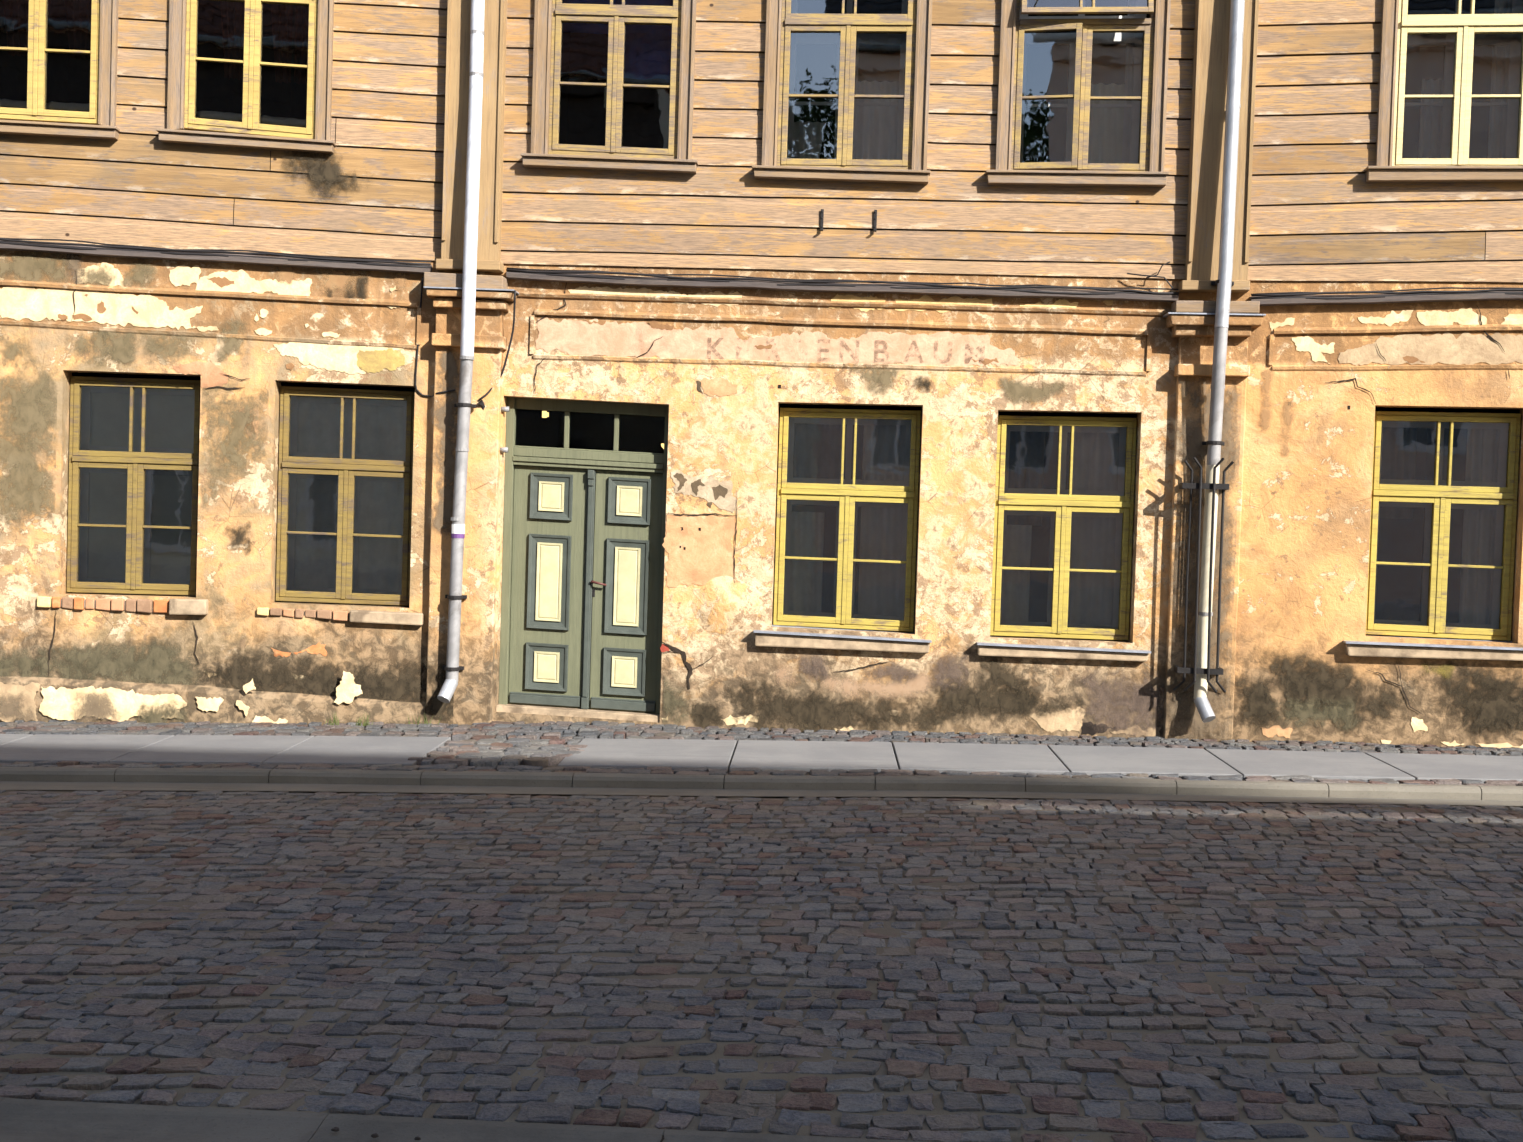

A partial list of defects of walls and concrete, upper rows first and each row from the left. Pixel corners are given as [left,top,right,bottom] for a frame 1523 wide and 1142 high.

leakage [77,331,189,365]
peeling [0,262,405,374]
leakage [218,321,244,360]
peeling [1266,307,1523,366]
leakage [0,336,57,524]
leakage [663,368,1406,740]
leakage [0,649,52,678]
spalling [0,678,288,724]
leakage [204,654,454,722]
spalling [334,671,363,705]
leakage [1433,665,1523,733]